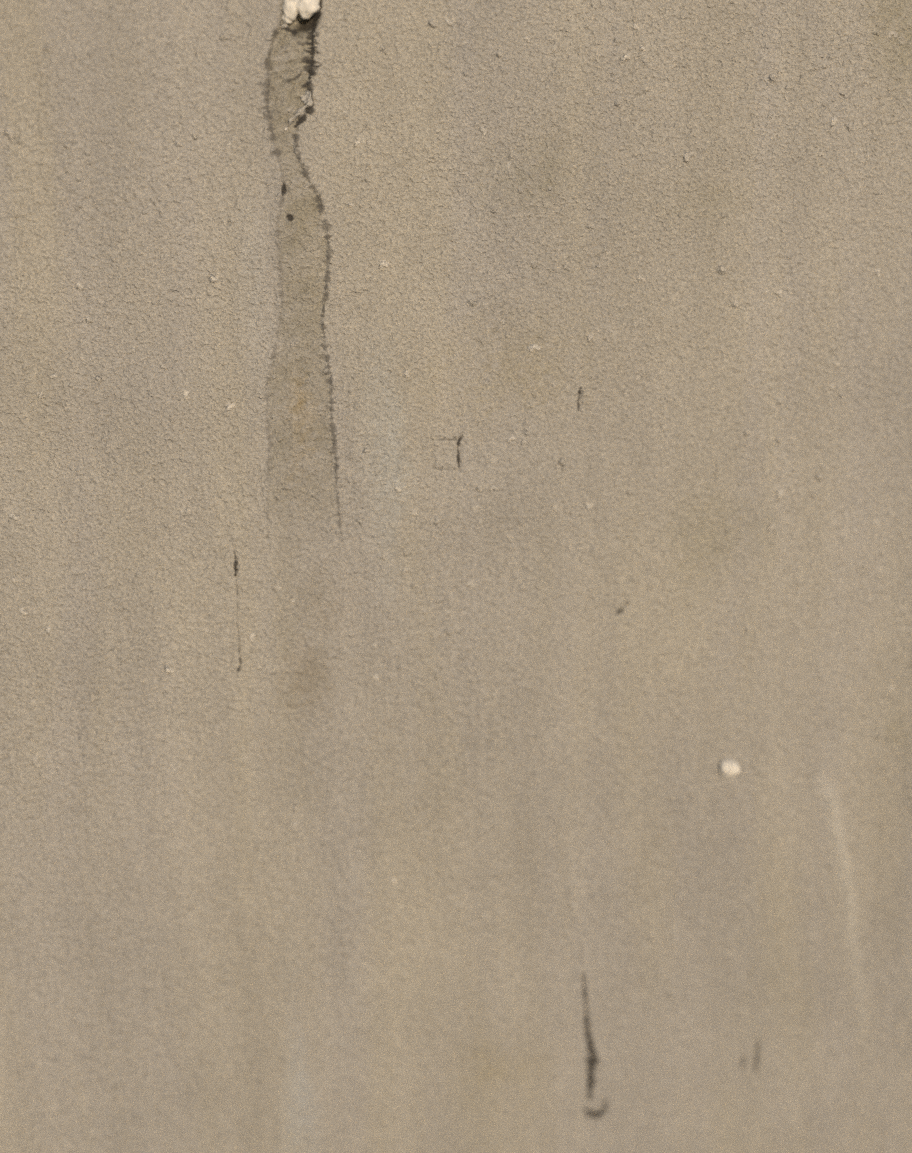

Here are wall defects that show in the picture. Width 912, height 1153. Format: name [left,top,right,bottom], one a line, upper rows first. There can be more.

peeling [262,0,350,915]
crack [582,973,607,1119]